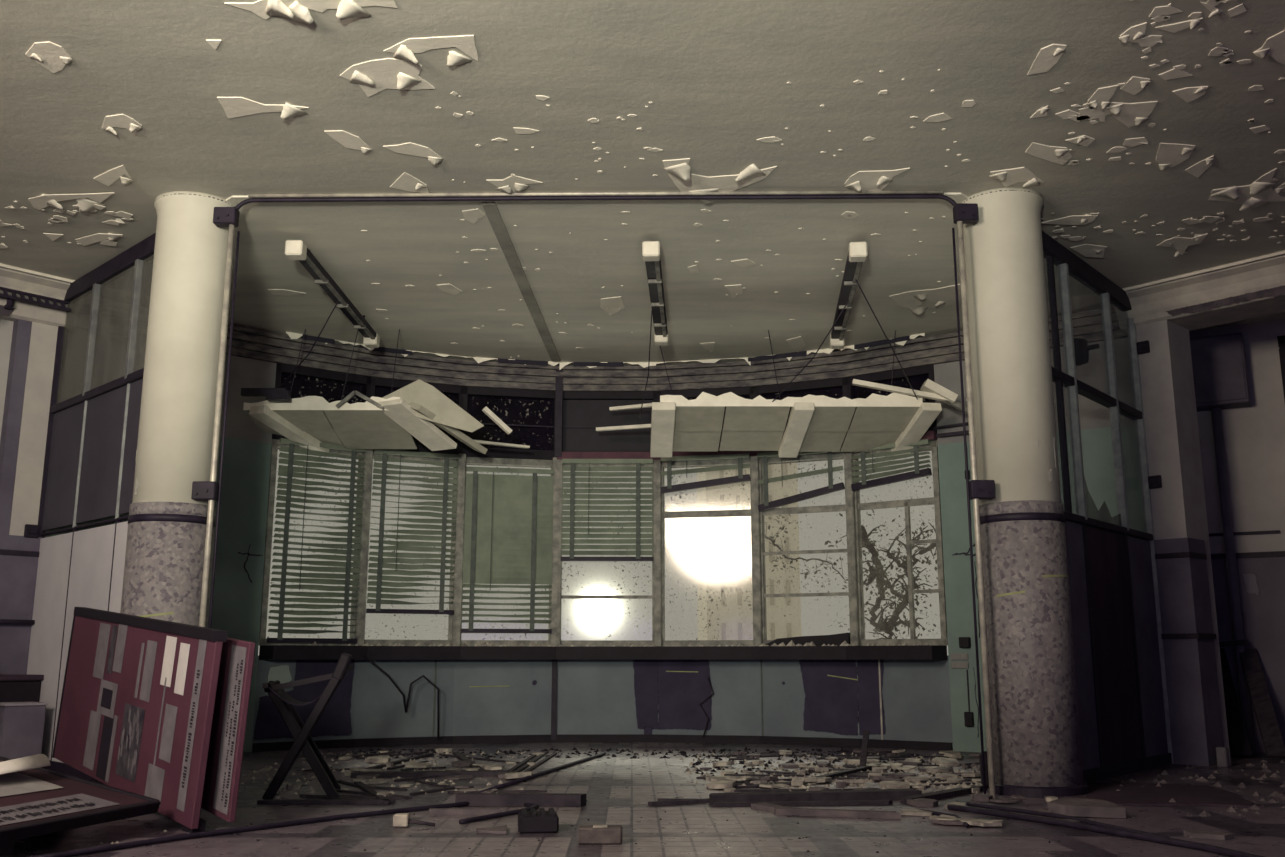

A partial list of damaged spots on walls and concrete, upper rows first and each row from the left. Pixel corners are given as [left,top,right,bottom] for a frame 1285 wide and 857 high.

peeling [224,0,398,25]
peeling [25,41,72,73]
peeling [102,114,143,136]
peeling [217,97,309,120]
peeling [324,130,443,165]
peeling [340,35,479,97]
peeling [910,100,976,167]
peeling [990,0,1285,187]
peeling [0,165,135,248]
peeling [486,174,542,194]
peeling [624,147,777,227]
peeling [1041,149,1285,258]